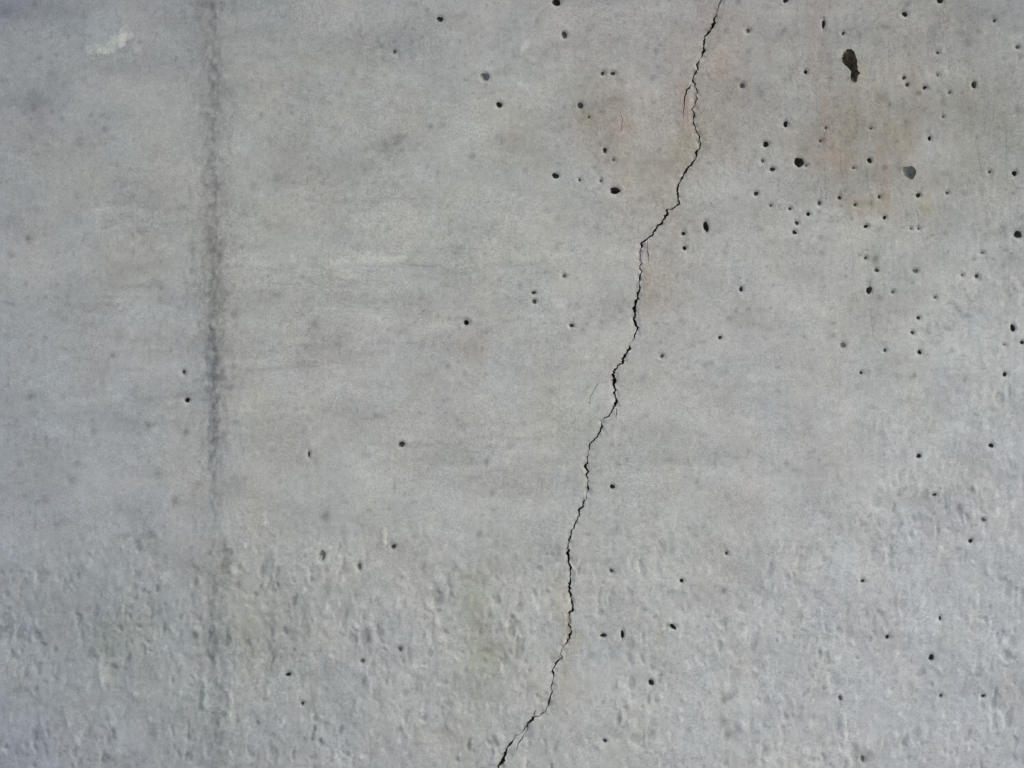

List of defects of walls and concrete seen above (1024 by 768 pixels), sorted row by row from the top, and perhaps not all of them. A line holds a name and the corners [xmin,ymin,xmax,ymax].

crack [497,0,725,768]